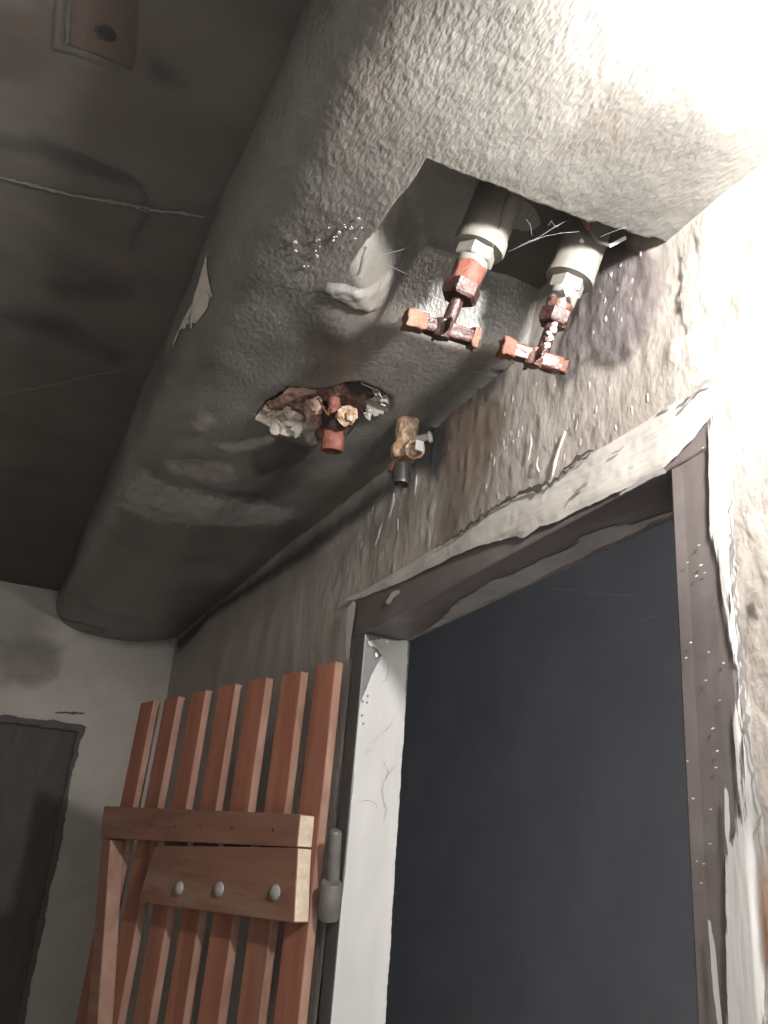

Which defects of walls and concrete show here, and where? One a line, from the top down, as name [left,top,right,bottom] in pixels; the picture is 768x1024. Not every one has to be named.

crack [0,177,208,235]
peeling [172,257,212,348]
spalling [255,381,392,445]
crack [436,450,593,548]